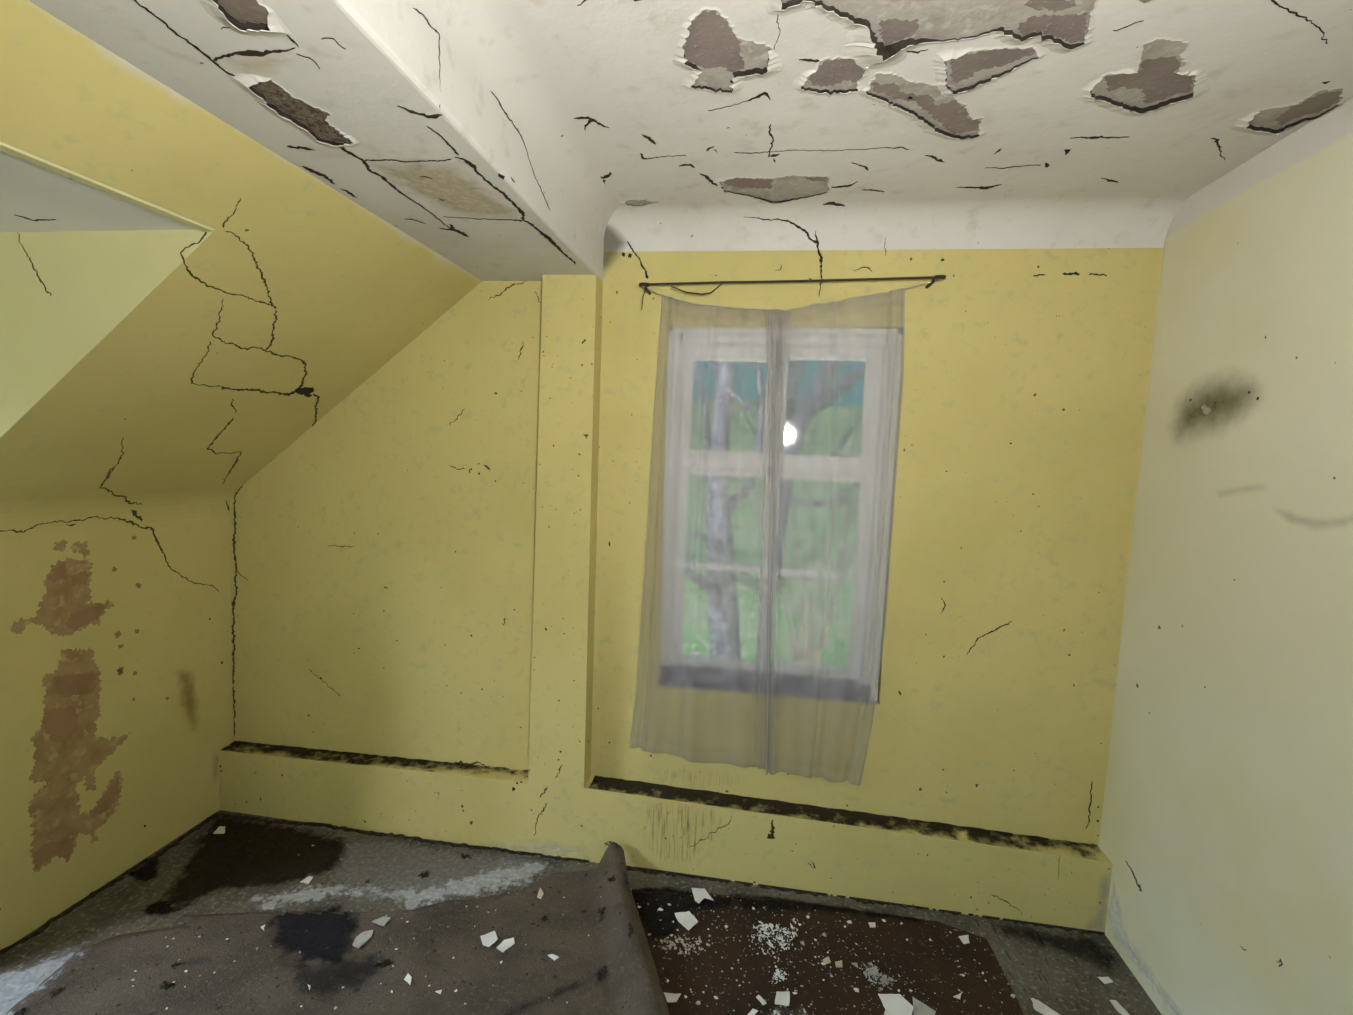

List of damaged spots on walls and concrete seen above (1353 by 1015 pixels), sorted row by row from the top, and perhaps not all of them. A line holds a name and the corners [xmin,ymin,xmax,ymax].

crack [134,0,345,76]
peeling [229,73,361,147]
crack [287,8,576,264]
peeling [672,6,784,95]
peeling [763,0,1099,142]
peeling [1077,36,1211,117]
crack [1271,0,1328,44]
water stain [402,170,499,211]
peeling [715,174,832,205]
crack [640,92,1127,297]
crack [0,197,320,736]
peeling [10,540,131,873]